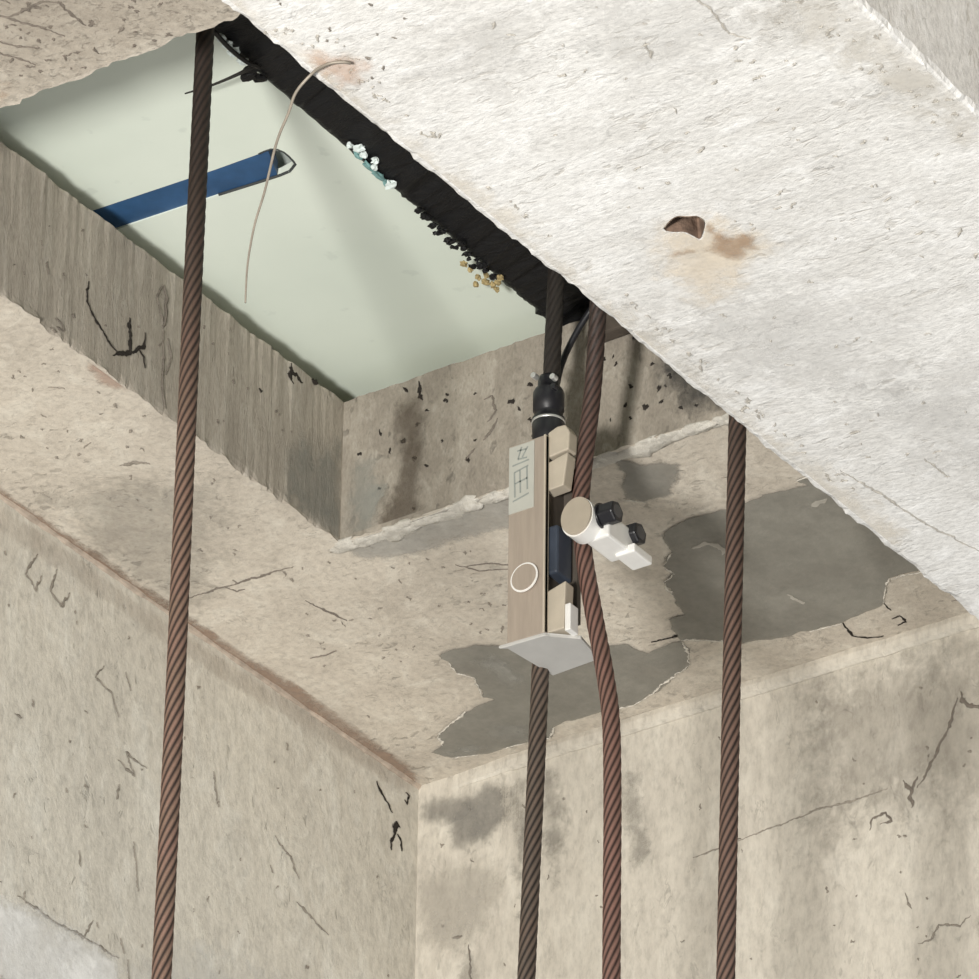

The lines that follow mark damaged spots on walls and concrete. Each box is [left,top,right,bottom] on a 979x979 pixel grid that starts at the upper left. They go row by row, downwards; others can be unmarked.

crack [0,0,86,66]
spalling [664,216,747,279]
corrosion [716,235,749,255]
crack [86,281,172,406]
water stain [665,363,706,404]
peeling [617,460,679,503]
peeling [742,477,921,643]
peeling [609,510,726,709]
crack [693,692,979,858]
water stain [430,790,504,839]
water stain [0,902,117,979]